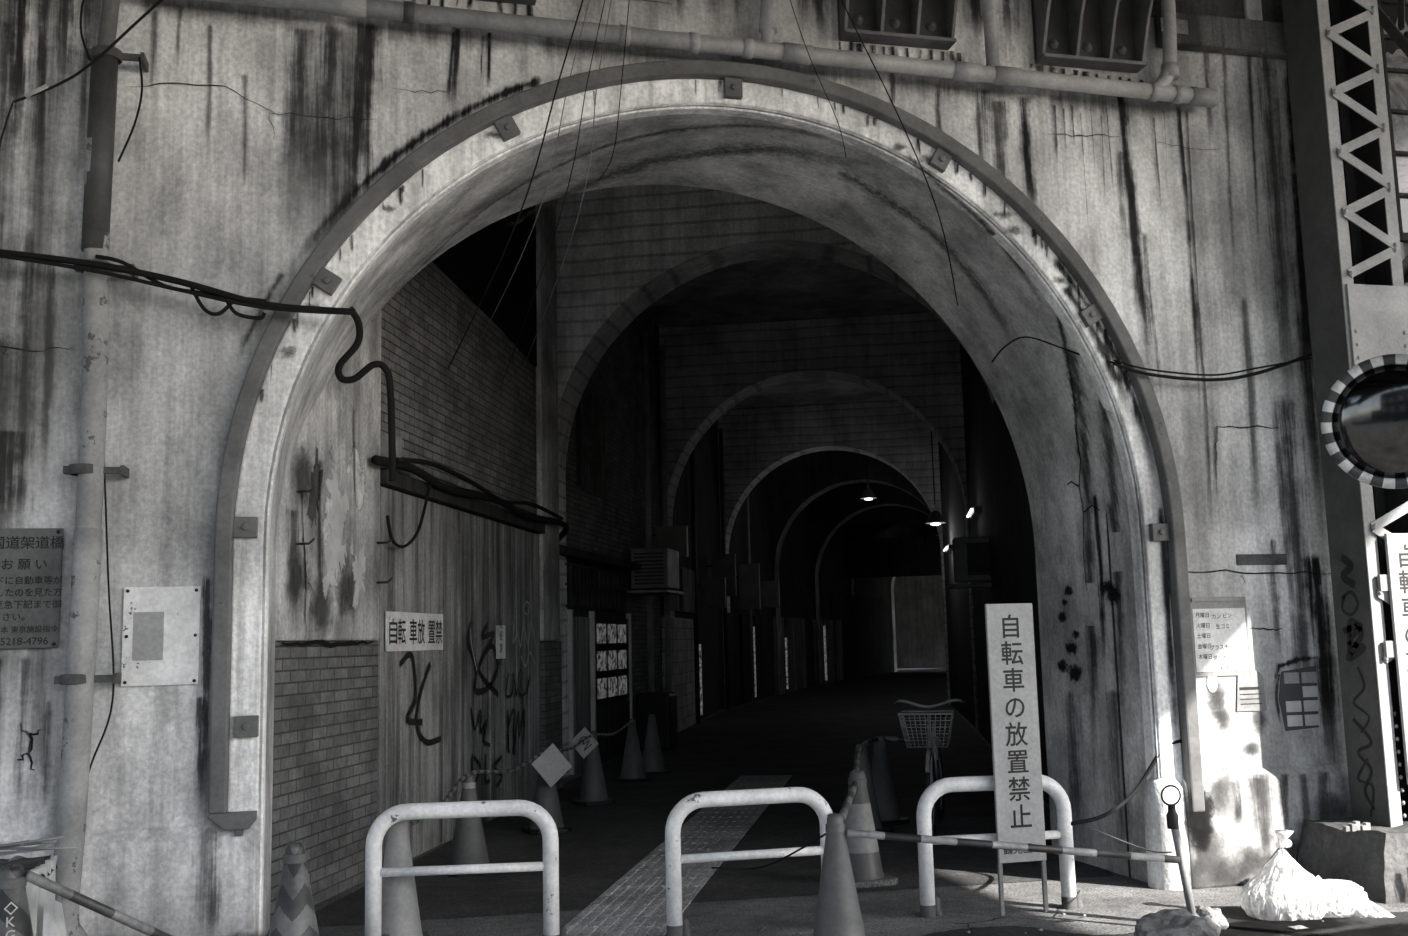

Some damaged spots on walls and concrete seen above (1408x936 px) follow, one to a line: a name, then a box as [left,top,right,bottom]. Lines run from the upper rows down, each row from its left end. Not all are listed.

damp [799,0,823,20]
damp [290,25,540,237]
damp [244,274,283,345]
damp [1153,110,1218,489]
damp [1247,56,1339,744]
damp [290,511,298,599]
crack [17,723,41,771]
damp [1186,773,1327,889]